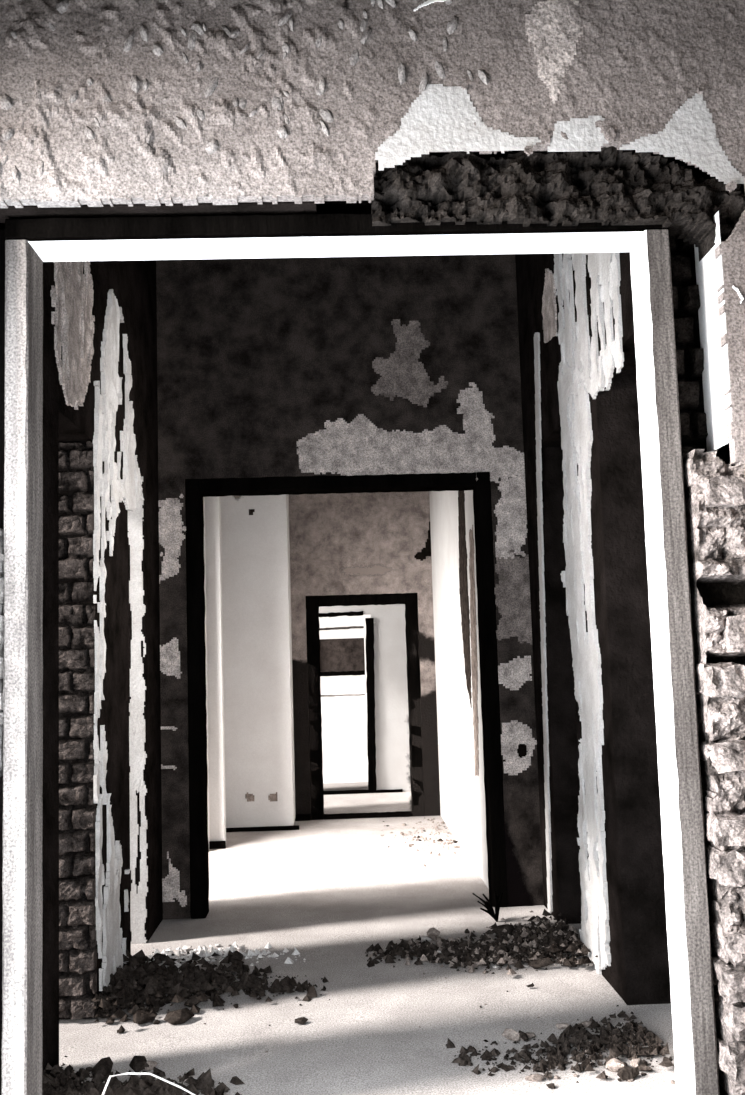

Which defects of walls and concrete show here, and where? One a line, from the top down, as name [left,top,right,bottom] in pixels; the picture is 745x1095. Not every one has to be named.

flaking render [371,83,745,262]
spalling [50,261,148,1020]
peeling [160,638,182,679]
peeling [158,494,186,584]
flaking render [297,252,624,975]
spalling [682,449,745,1095]
peeling [162,851,187,907]